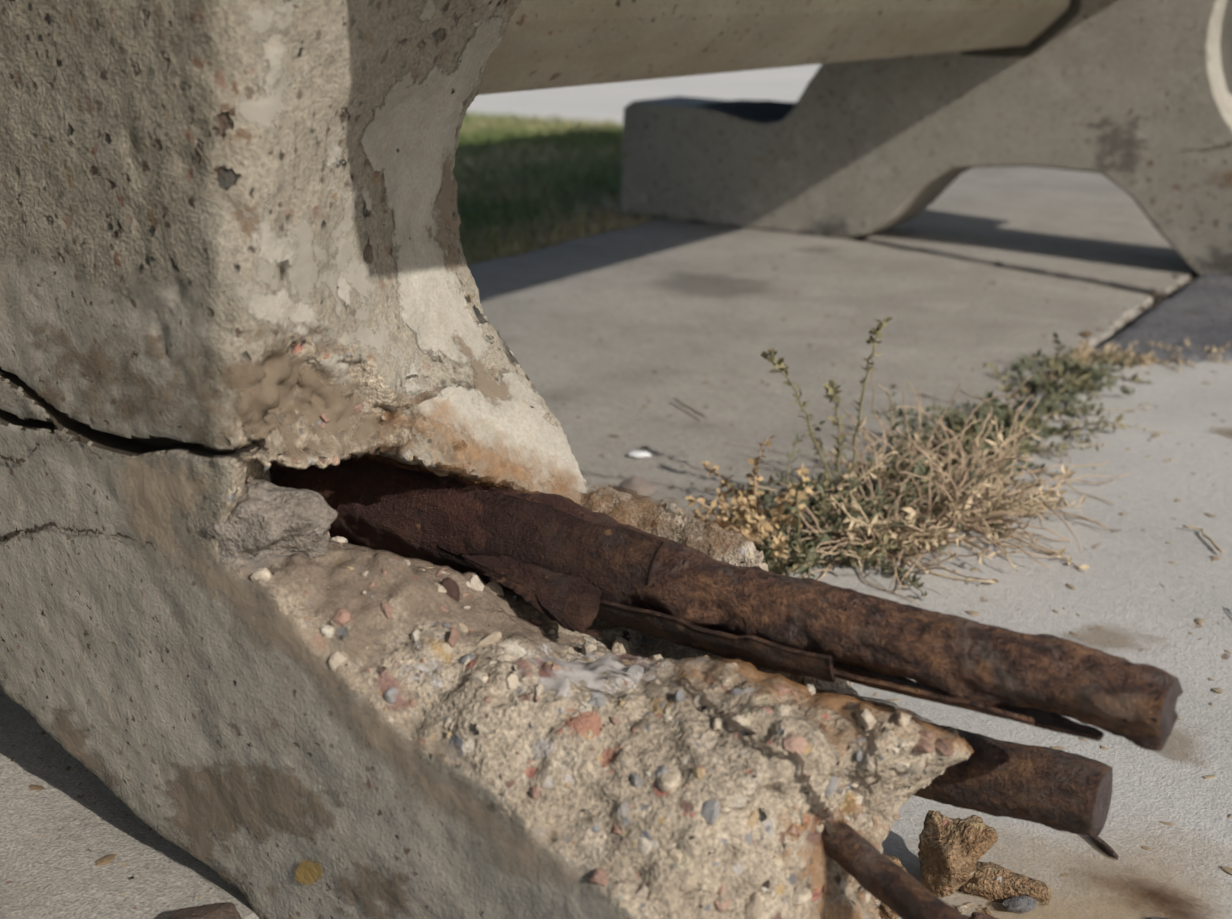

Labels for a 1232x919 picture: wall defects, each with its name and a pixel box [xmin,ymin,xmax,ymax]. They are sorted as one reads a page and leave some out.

peeling [226,0,768,571]
crack [0,366,268,464]
crack [0,522,156,550]
peeling [48,708,123,788]
spalling [219,555,971,919]
crack [679,678,836,834]
crack [845,702,881,794]
peeling [156,760,343,885]